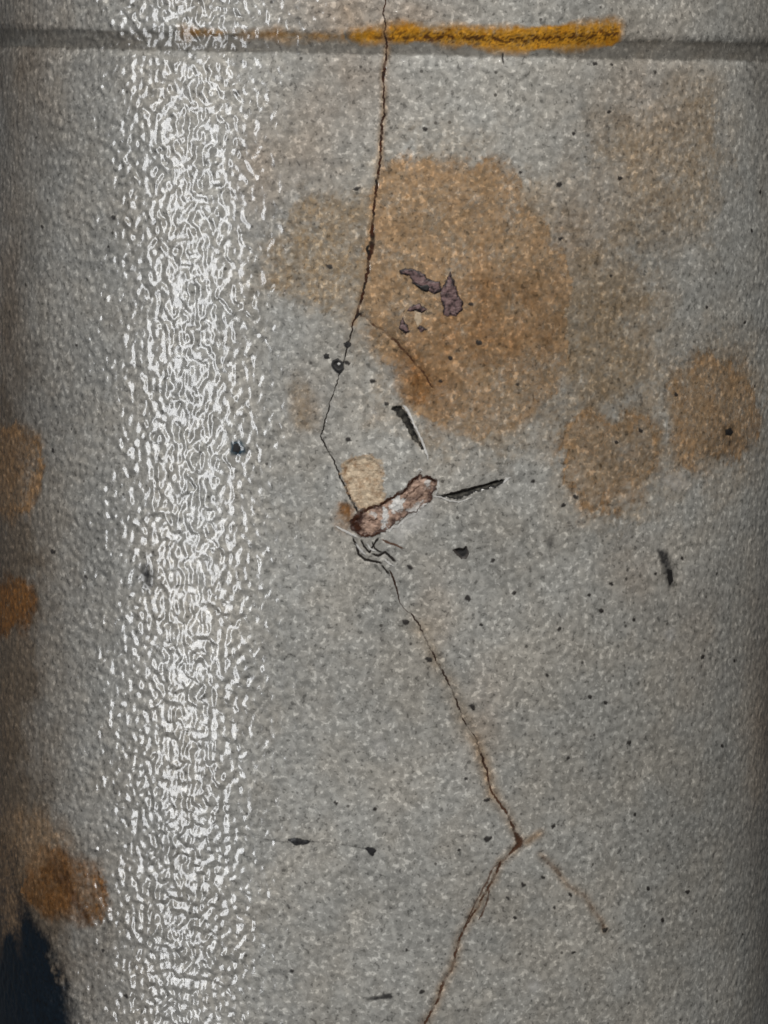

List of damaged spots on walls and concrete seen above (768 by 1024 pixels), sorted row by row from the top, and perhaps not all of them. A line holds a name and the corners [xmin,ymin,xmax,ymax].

peeling [399,303,427,334]
peeling [400,268,463,316]
spalling [339,406,510,537]
crack [320,0,536,1024]
rust [5,814,108,922]